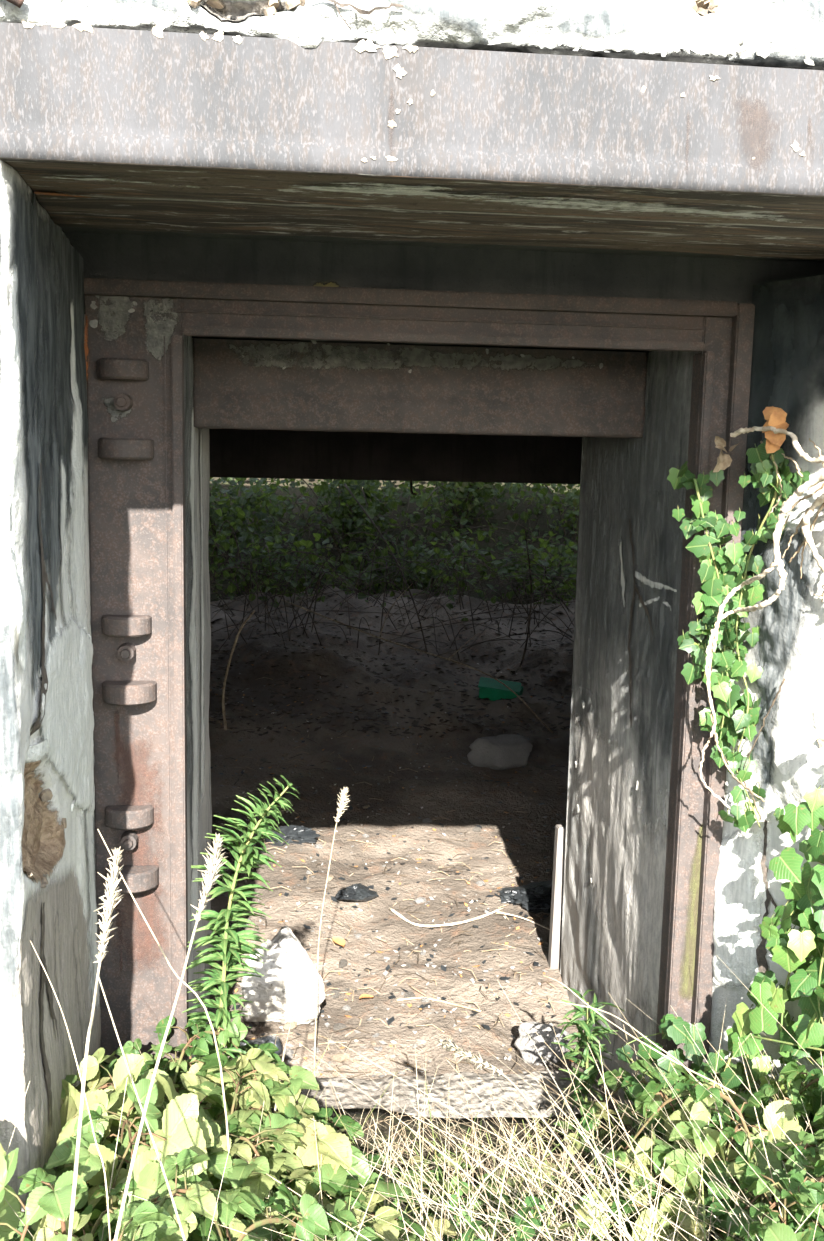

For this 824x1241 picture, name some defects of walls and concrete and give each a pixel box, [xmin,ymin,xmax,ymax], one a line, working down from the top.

peeling [49,17,115,33]
peeling [152,22,165,38]
spalling [187,0,306,44]
water stain [297,183,802,223]
water stain [749,286,814,481]
water stain [748,463,815,810]
water stain [0,190,101,1229]
peeling [21,619,94,888]
rust [115,711,145,806]
rust [133,819,156,866]
rust [116,891,160,969]